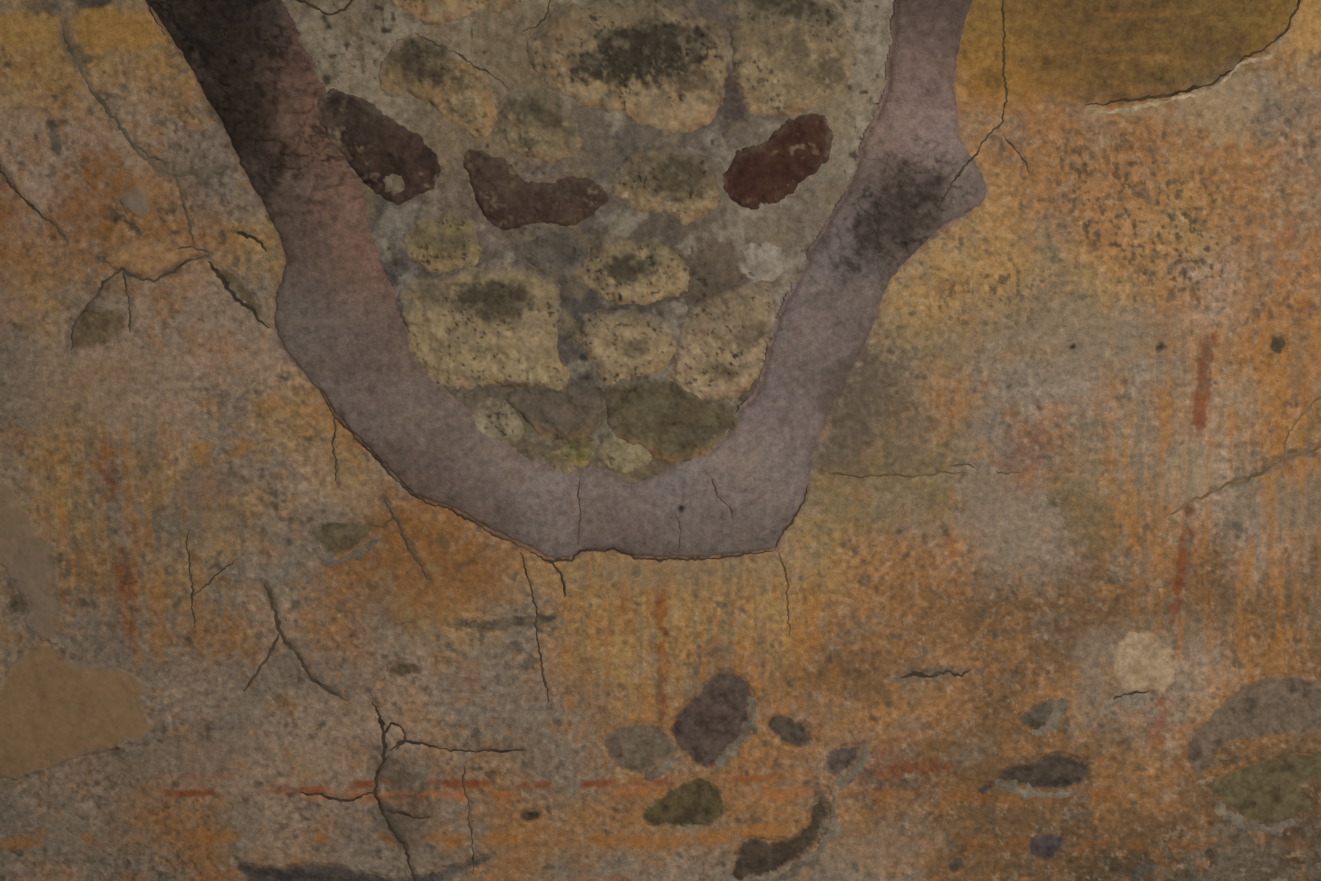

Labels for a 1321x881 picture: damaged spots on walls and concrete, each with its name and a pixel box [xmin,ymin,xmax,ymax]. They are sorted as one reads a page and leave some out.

crack [0,165,69,243]
crack [185,528,234,628]
crack [243,583,525,881]